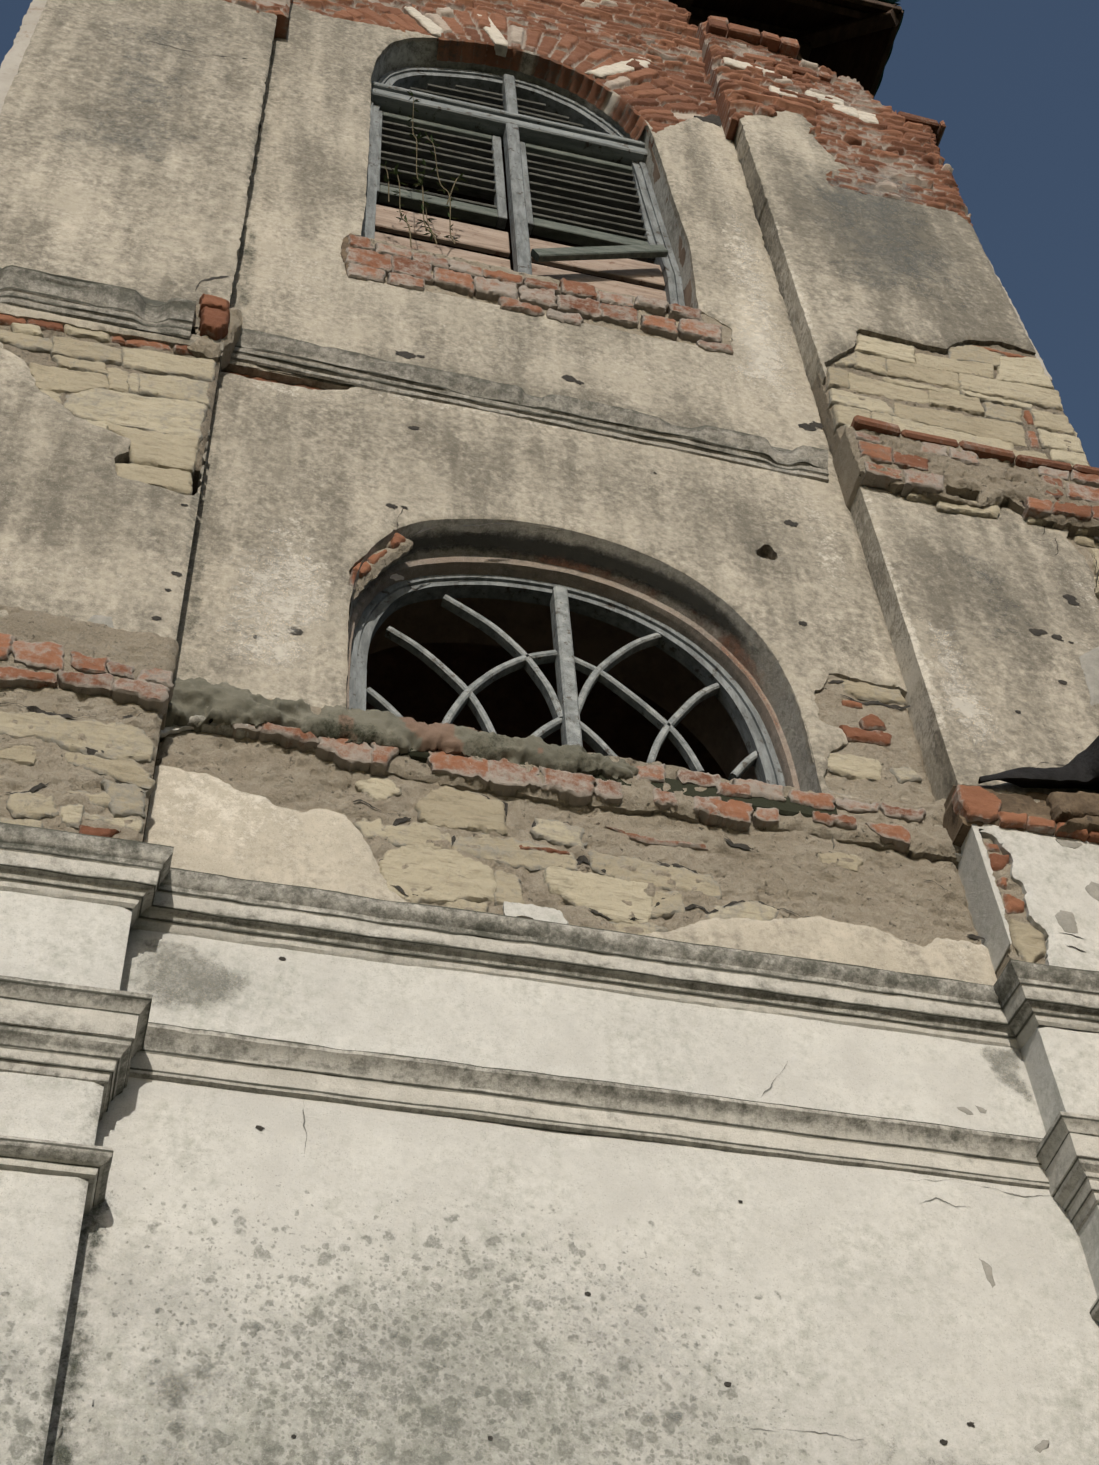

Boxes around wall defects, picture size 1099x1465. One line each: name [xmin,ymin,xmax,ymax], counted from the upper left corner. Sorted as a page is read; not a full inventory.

flaking render [223,0,973,227]
flaking render [0,293,326,506]
flaking render [395,350,424,359]
flaking render [340,233,734,355]
flaking render [798,333,1099,605]
peeling [1029,628,1099,706]
flaking render [0,674,982,947]
flaking render [982,838,1046,980]
peeling [1055,910,1078,933]
peeling [1055,839,1083,849]
peeling [1085,881,1099,901]